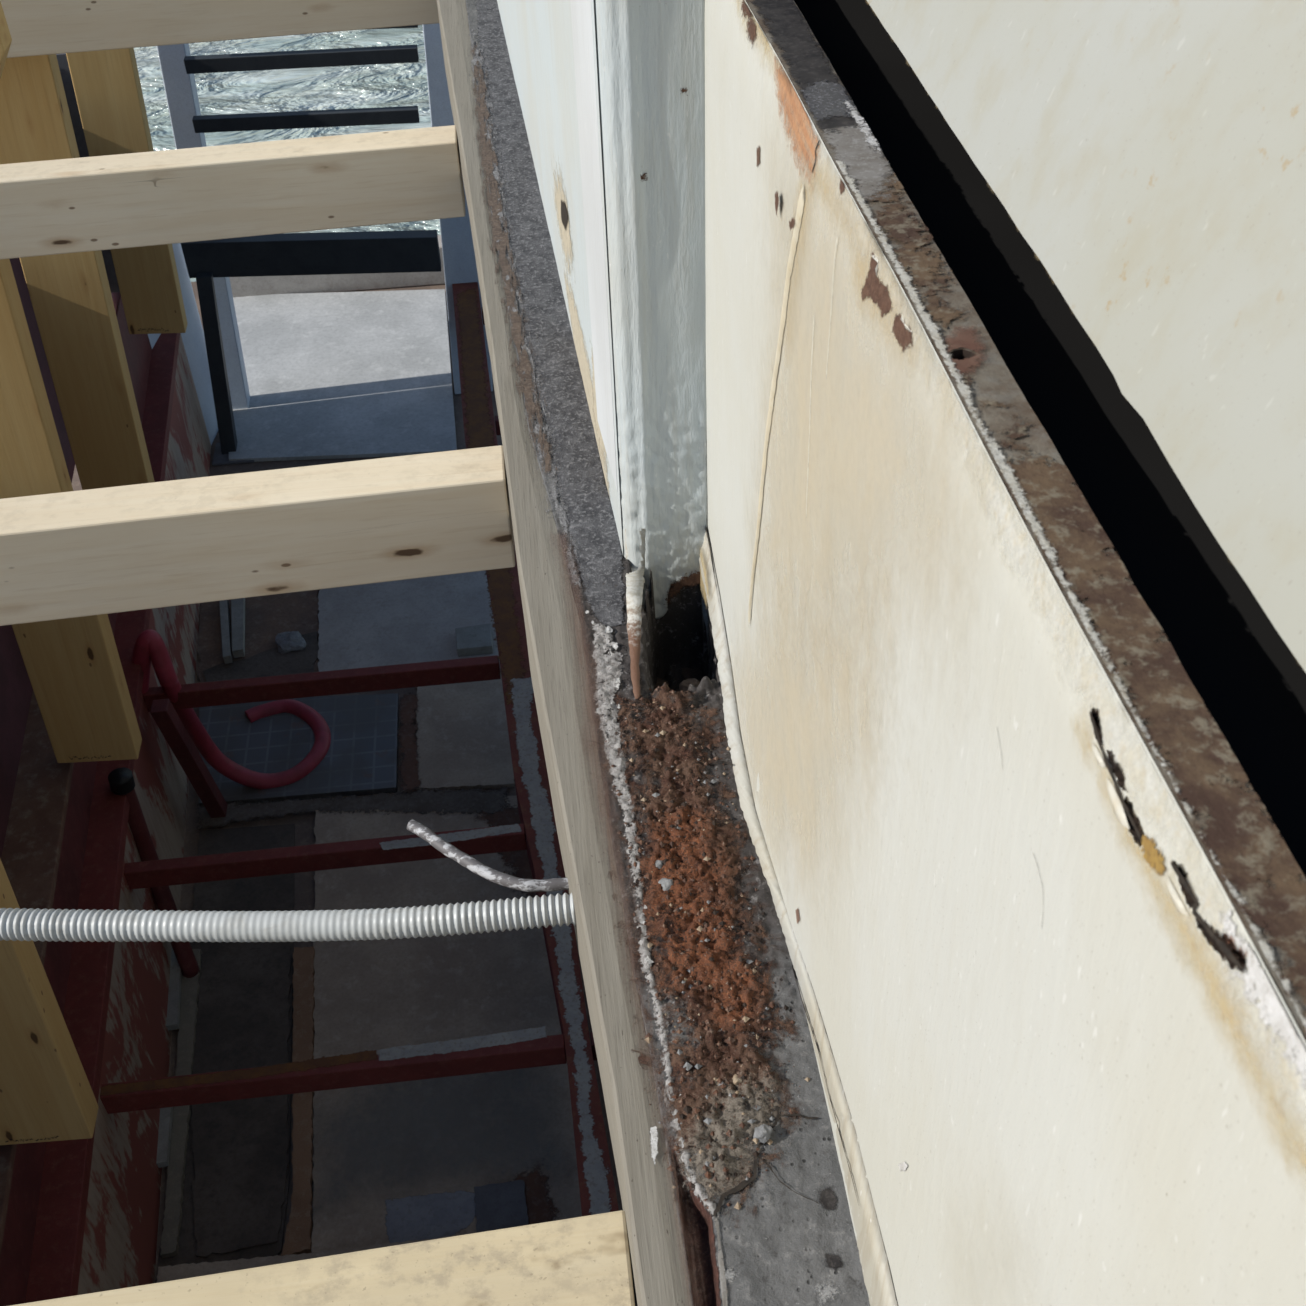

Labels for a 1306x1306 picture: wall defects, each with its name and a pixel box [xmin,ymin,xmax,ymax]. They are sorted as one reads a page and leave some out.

corrosion [741,0,819,624]
corrosion [864,173,972,329]
damp [585,610,723,1220]
crack [713,967,858,1216]
corrosion [980,400,1306,1034]